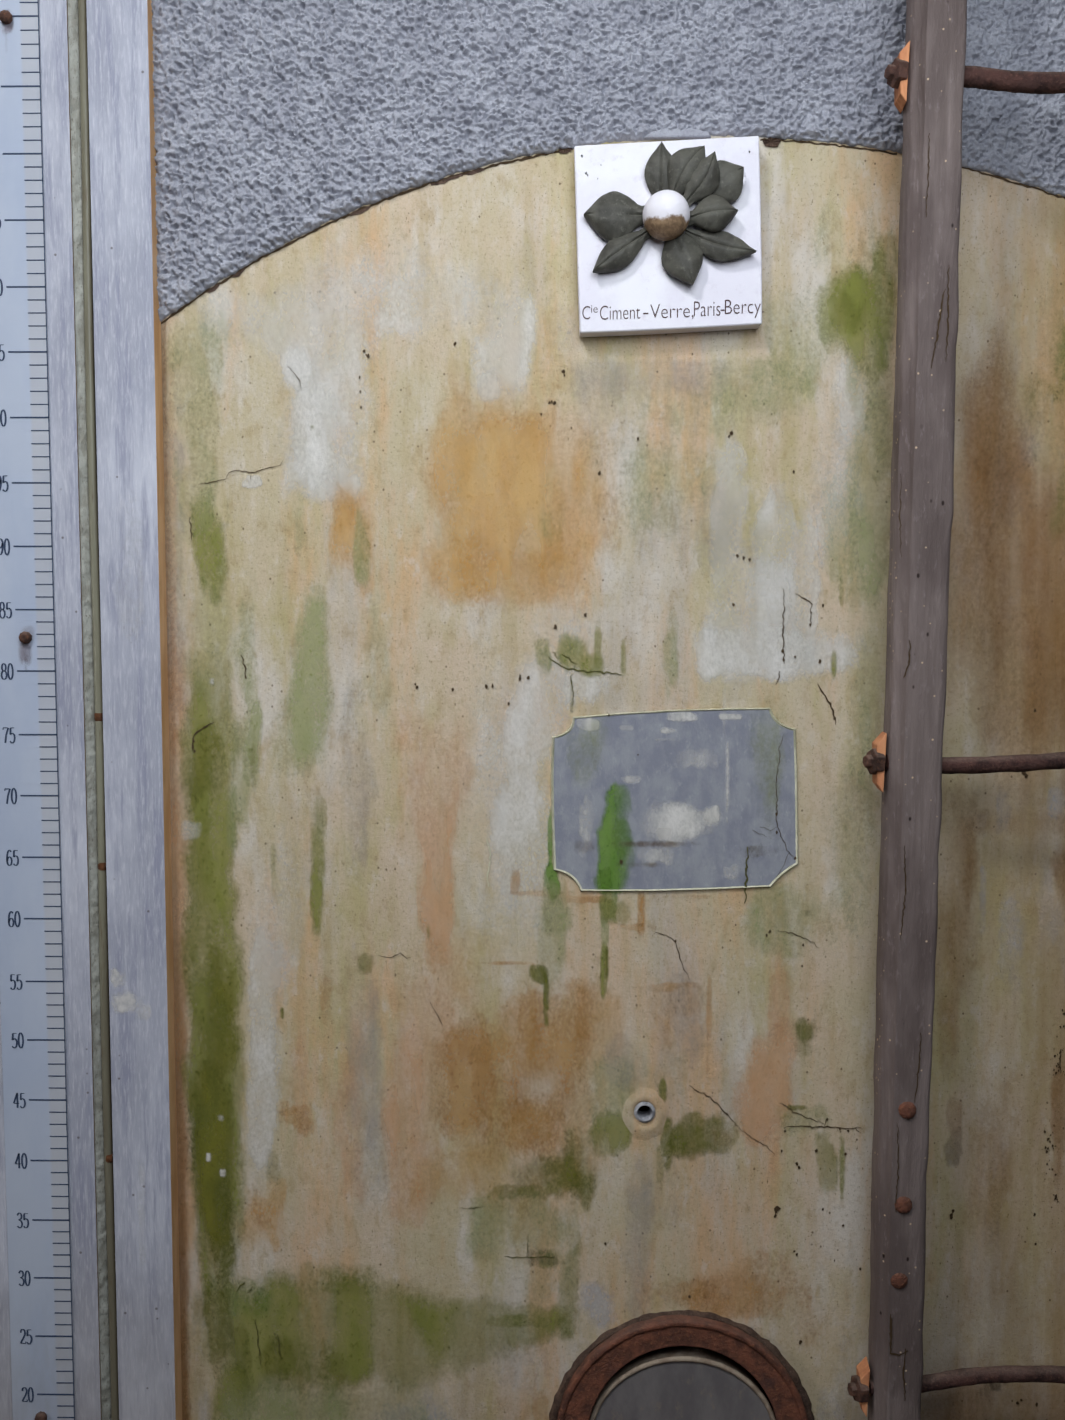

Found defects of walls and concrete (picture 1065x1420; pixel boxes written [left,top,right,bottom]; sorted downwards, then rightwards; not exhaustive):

crack [198,462,282,485]
crack [689,1085,861,1155]
damp [174,957,235,1420]